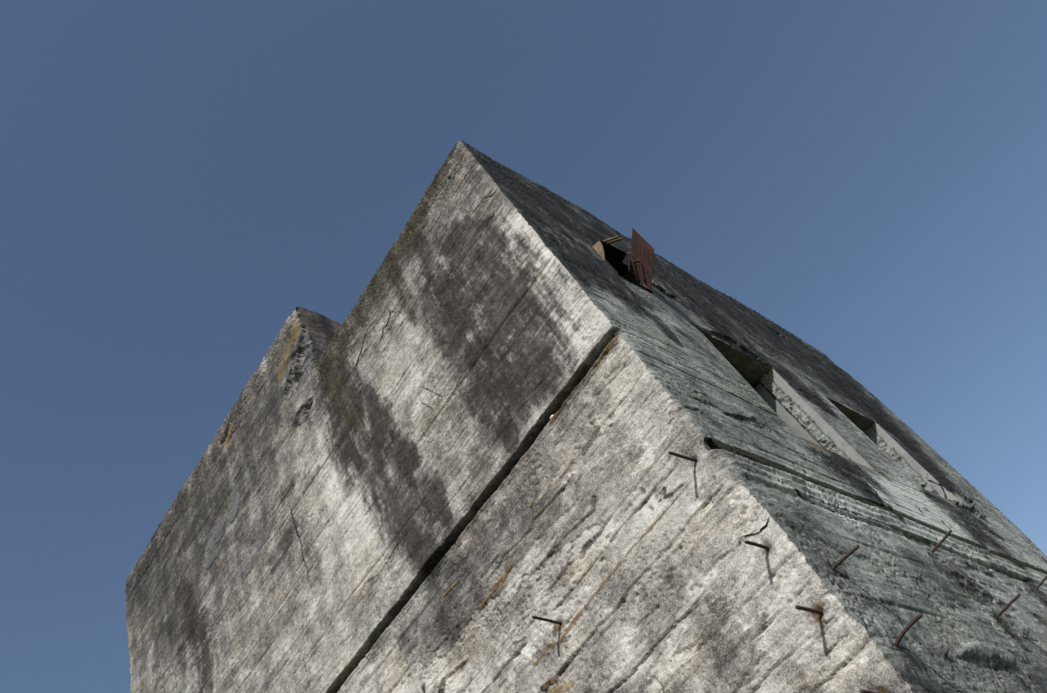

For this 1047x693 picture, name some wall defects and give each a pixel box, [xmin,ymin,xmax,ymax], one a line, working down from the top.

damp [312,351,453,576]
damp [389,140,1047,606]
rust [811,601,827,623]